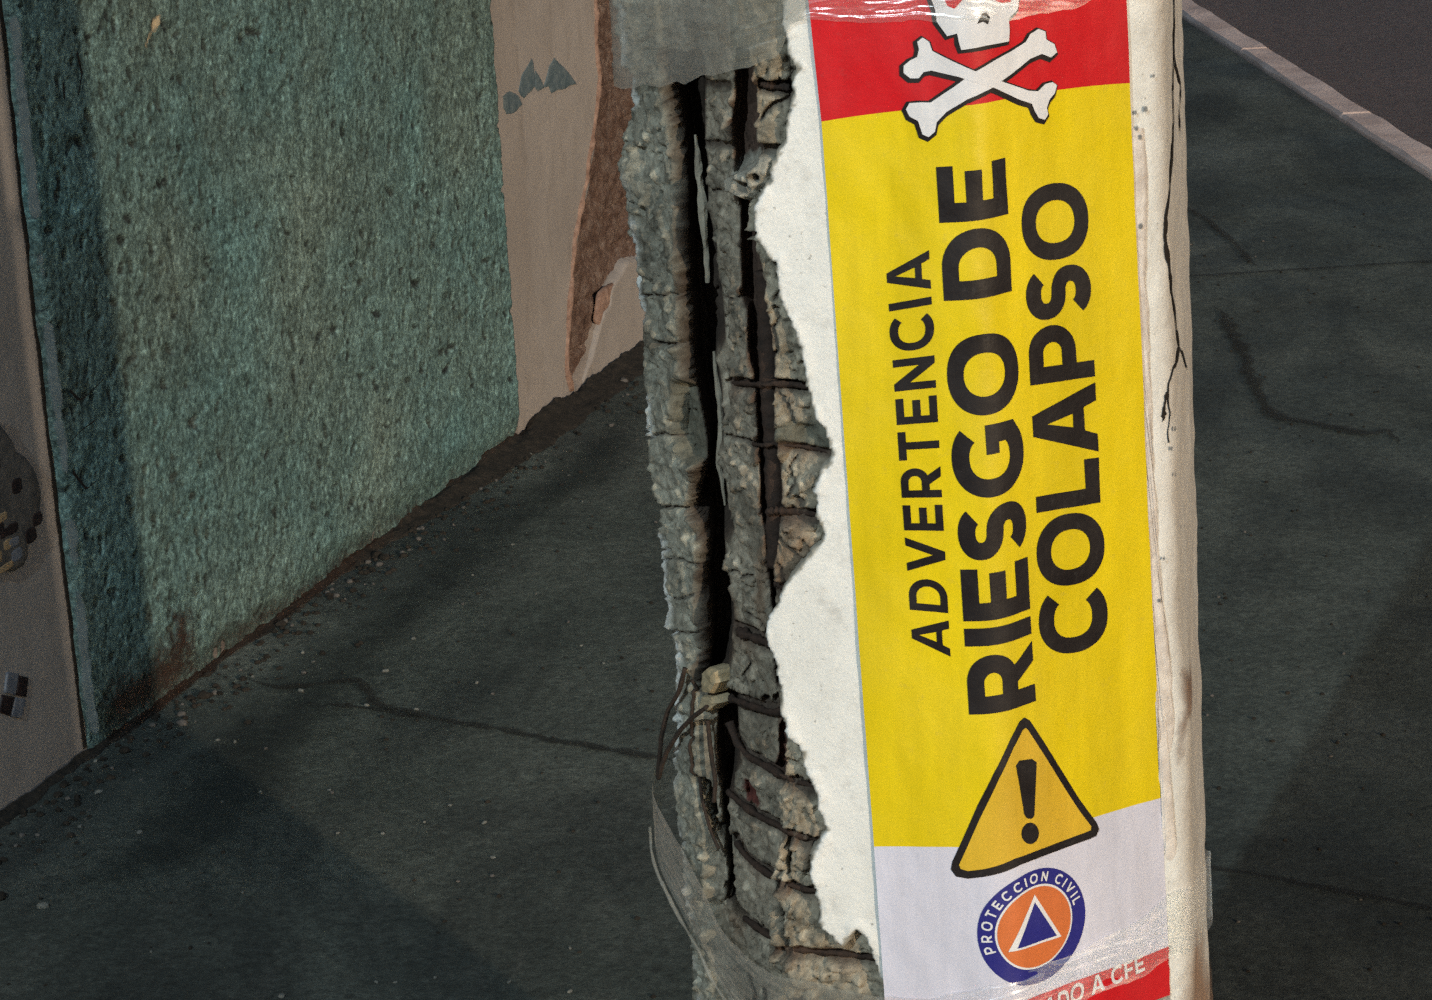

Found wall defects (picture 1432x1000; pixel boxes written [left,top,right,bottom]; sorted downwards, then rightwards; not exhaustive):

peeling [503,58,576,114]
crack [1161,0,1188,443]
spalling [565,0,885,1000]